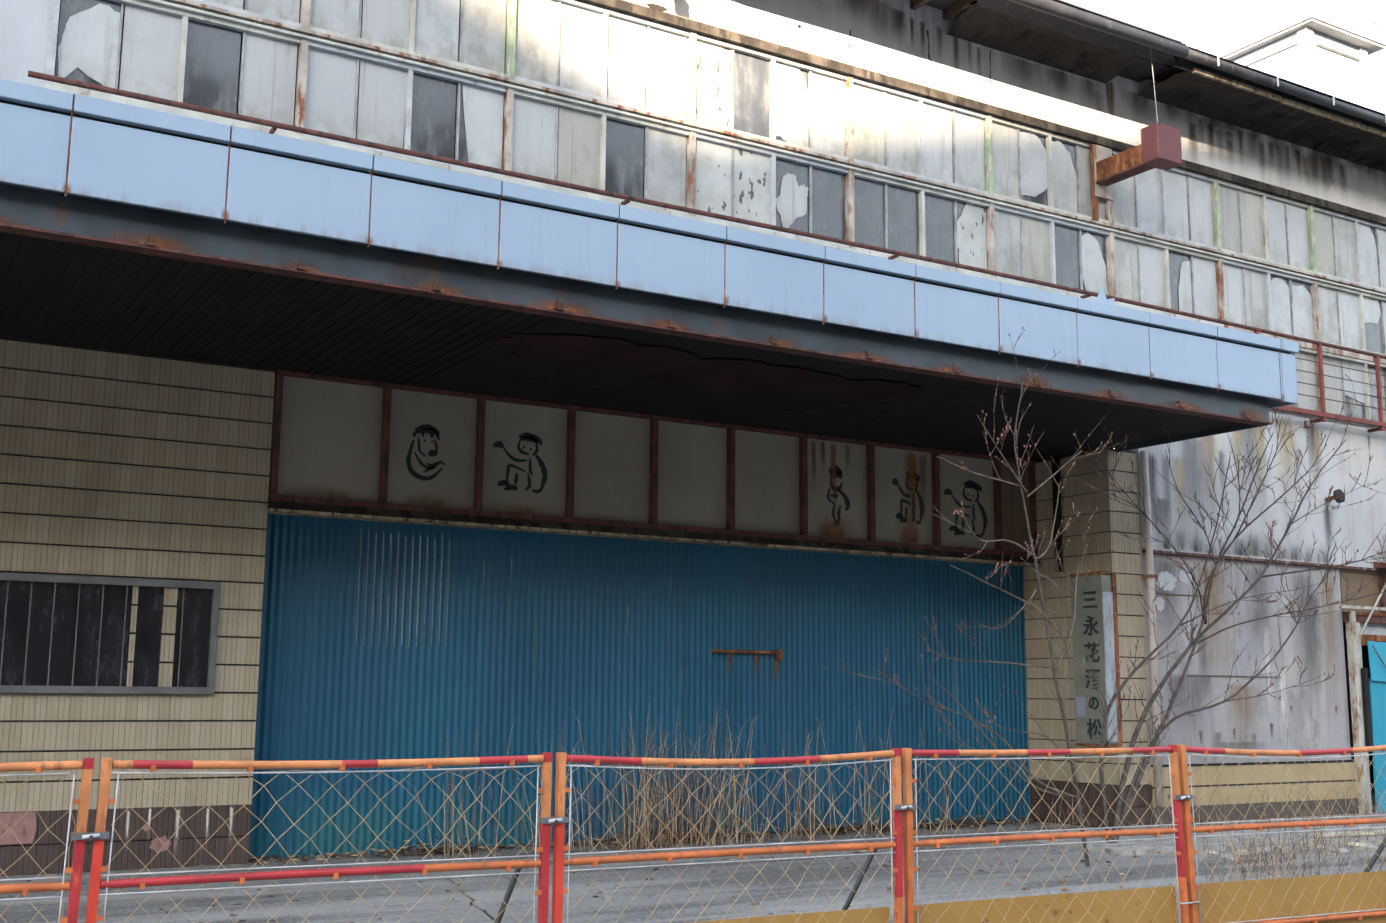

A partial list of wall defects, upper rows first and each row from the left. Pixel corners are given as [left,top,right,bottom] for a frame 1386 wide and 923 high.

leakage [1167,104,1376,178]
corrosion [542,304,583,314]
leakage [1149,427,1262,514]
leakage [1159,542,1325,598]